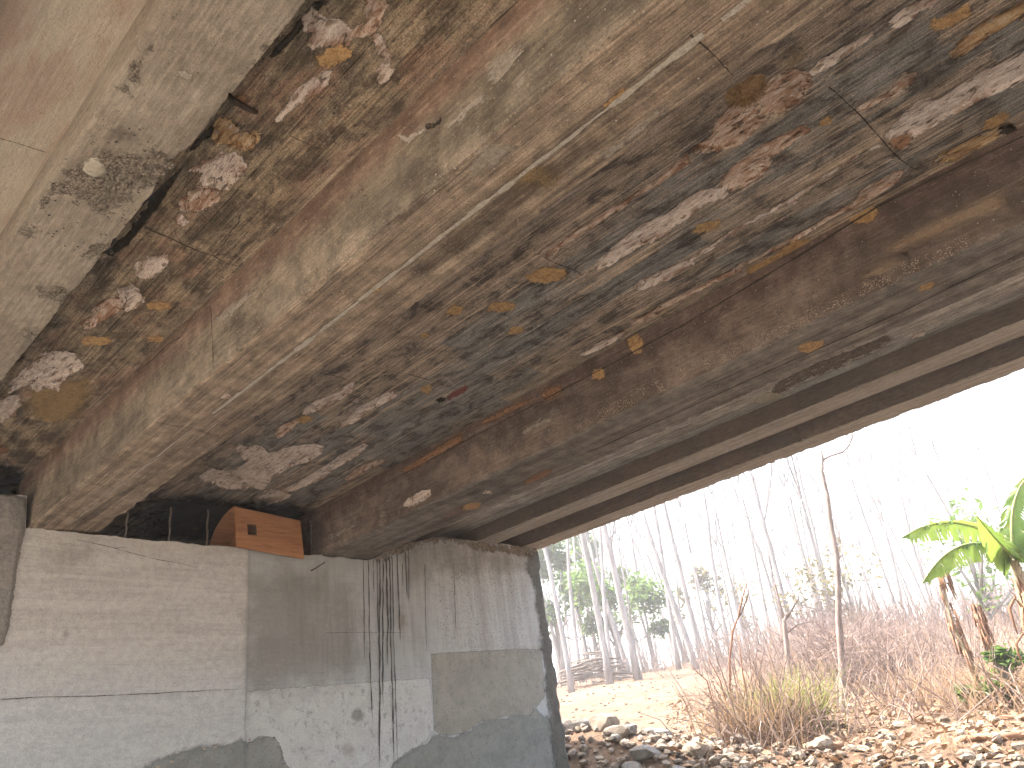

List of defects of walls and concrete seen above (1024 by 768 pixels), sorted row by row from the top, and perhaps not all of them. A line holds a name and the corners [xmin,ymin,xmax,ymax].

spalling [302,0,395,84]
crack [690,34,733,75]
spalling [175,117,262,226]
spalling [545,32,873,271]
spalling [634,51,1024,290]
crack [828,87,922,173]
crack [133,213,241,267]
spalling [80,253,170,331]
spalling [0,350,85,423]
spalling [199,382,388,505]
spalling [403,489,432,508]
damp [363,548,570,768]